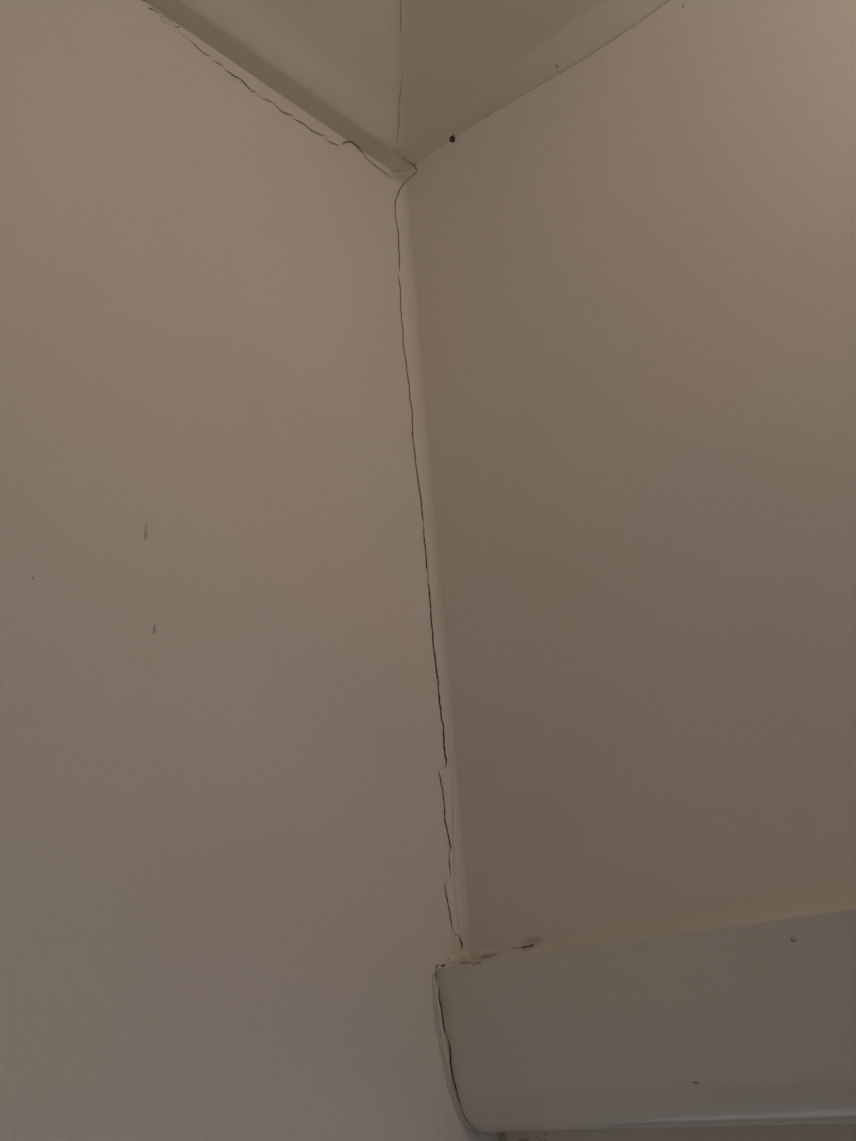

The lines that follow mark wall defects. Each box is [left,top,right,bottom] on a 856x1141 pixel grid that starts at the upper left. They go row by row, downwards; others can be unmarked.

crack [143,0,520,1136]